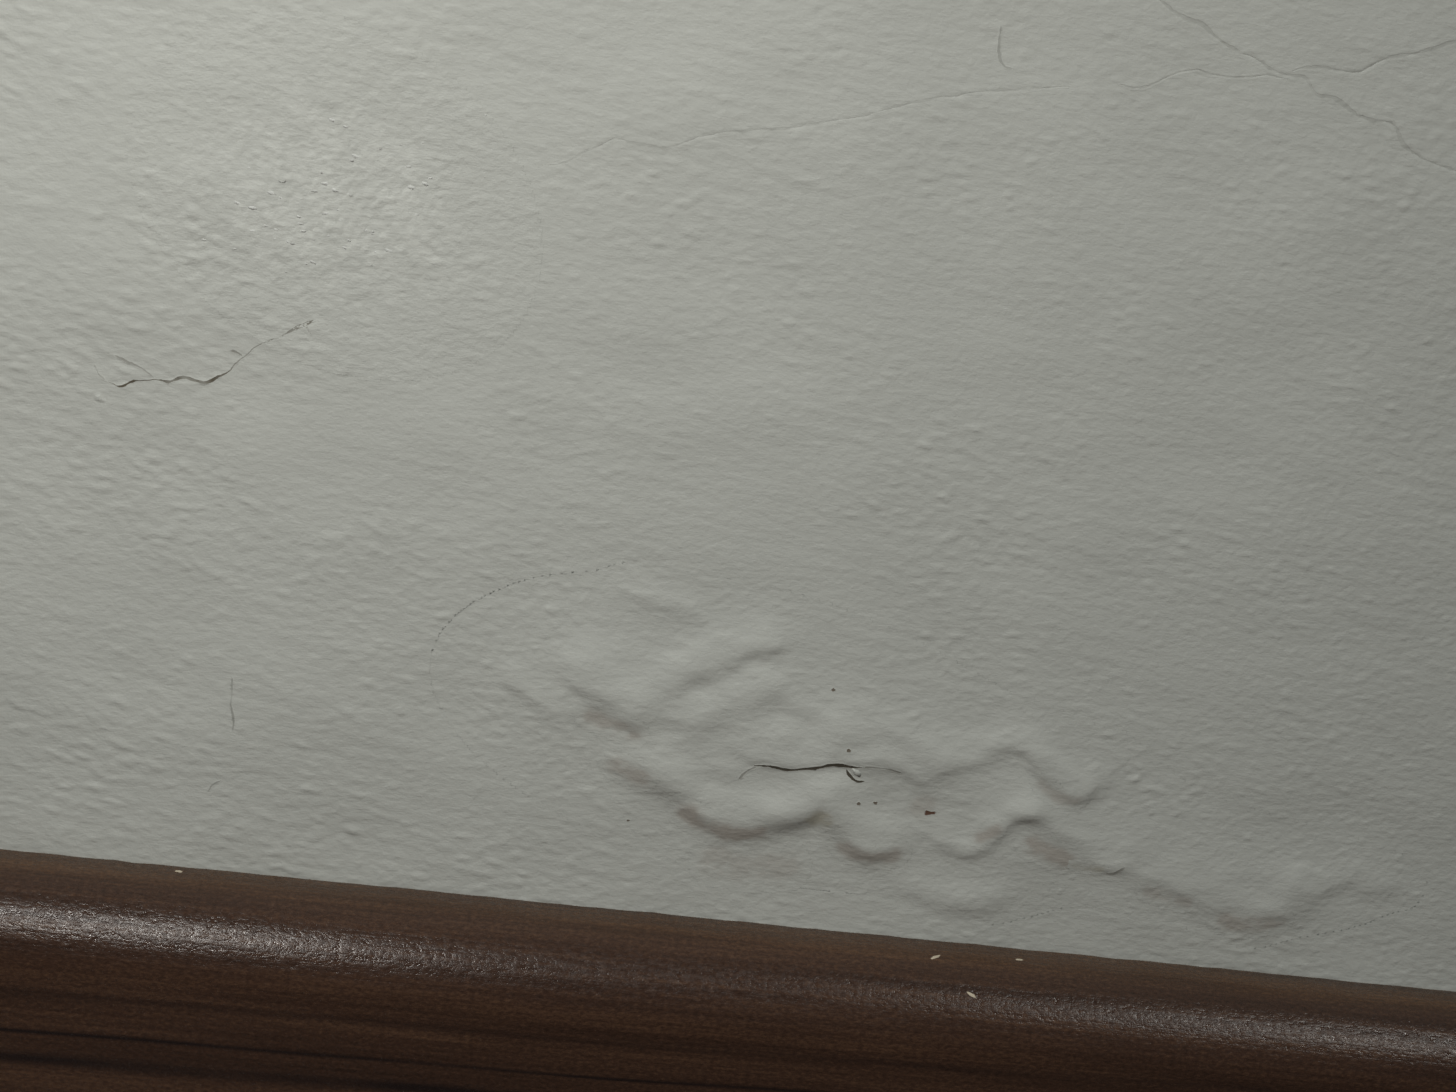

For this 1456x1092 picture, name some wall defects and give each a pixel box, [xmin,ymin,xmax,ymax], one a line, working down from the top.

crack [93,318,323,388]
crack [738,762,903,783]